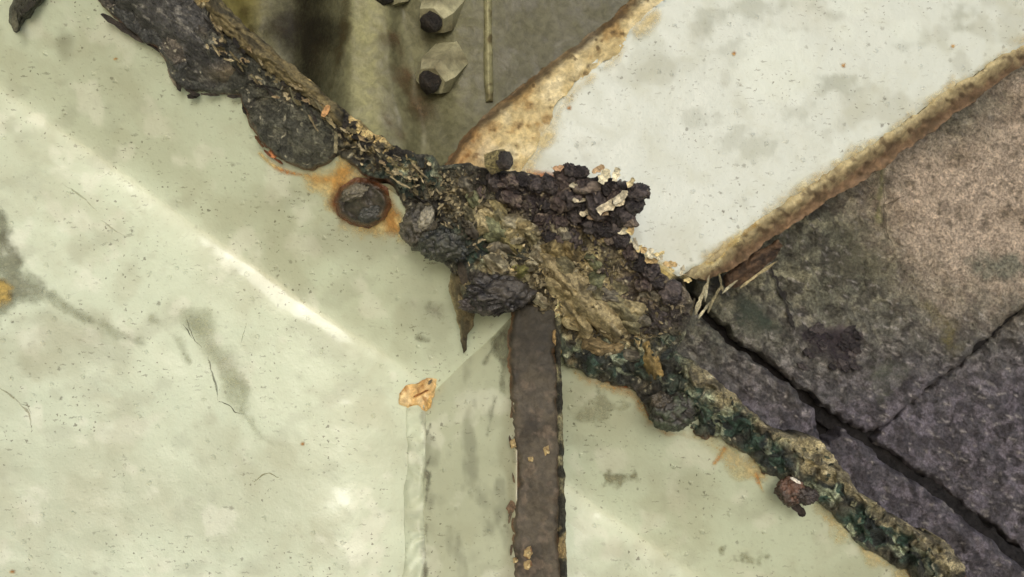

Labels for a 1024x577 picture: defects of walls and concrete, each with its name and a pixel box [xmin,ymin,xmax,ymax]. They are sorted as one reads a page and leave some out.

corrosion [98,0,366,165]
peeling [569,164,635,221]
corrosion [282,0,966,577]
corrosion [682,45,1024,281]
crack [689,292,1024,568]